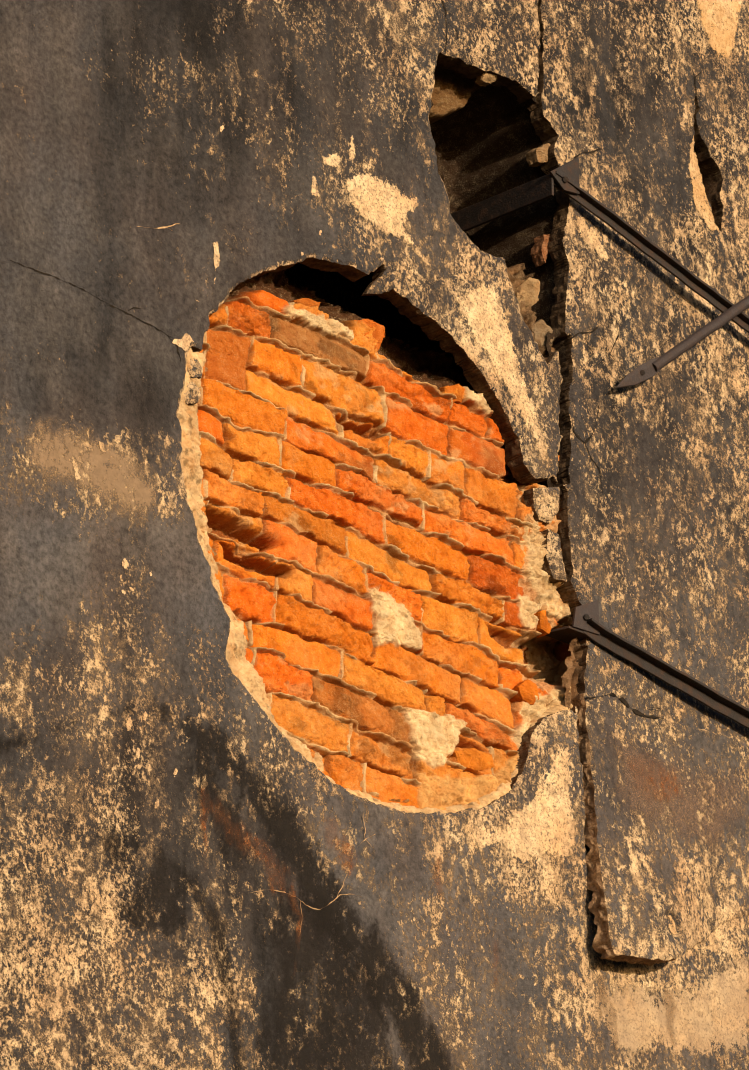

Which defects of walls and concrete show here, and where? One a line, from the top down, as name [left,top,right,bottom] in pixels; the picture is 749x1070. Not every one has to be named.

spalling [428,62,550,214]
crack [574,148,601,158]
crack [11,260,191,362]
flaking render [361,257,395,296]
spalling [456,194,560,461]
crack [537,316,625,495]
flaking render [172,270,578,871]
crack [561,638,664,719]